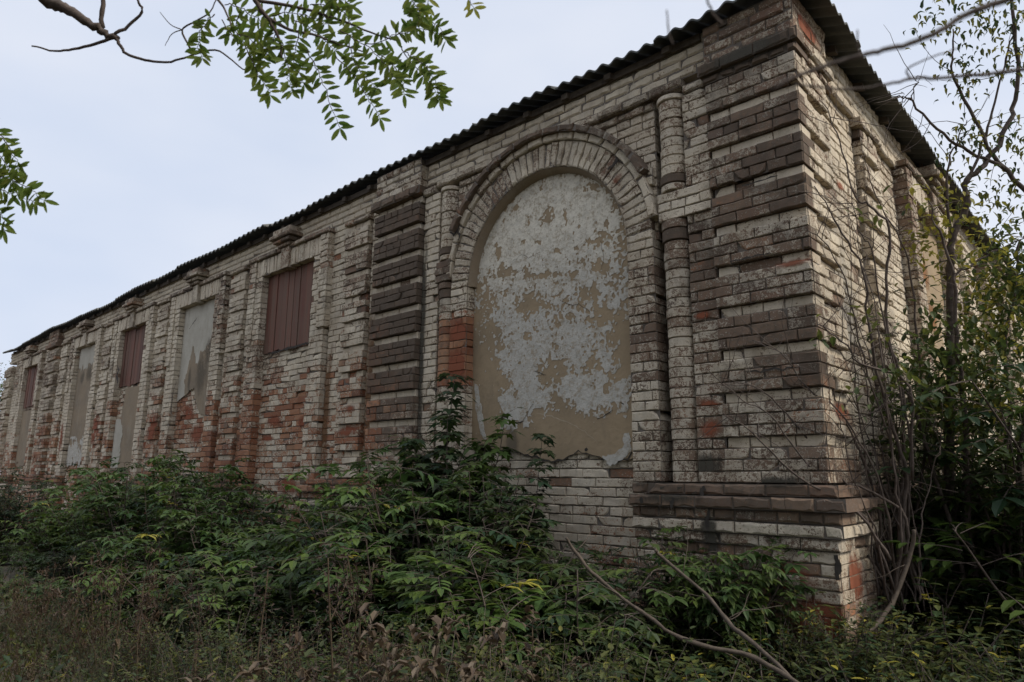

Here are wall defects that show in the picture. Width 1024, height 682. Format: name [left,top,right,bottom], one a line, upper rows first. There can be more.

peeling [474,173,631,440]
flaking render [183,336,212,442]
peeling [58,416,99,468]
peeling [110,419,123,468]
peeling [602,433,632,466]